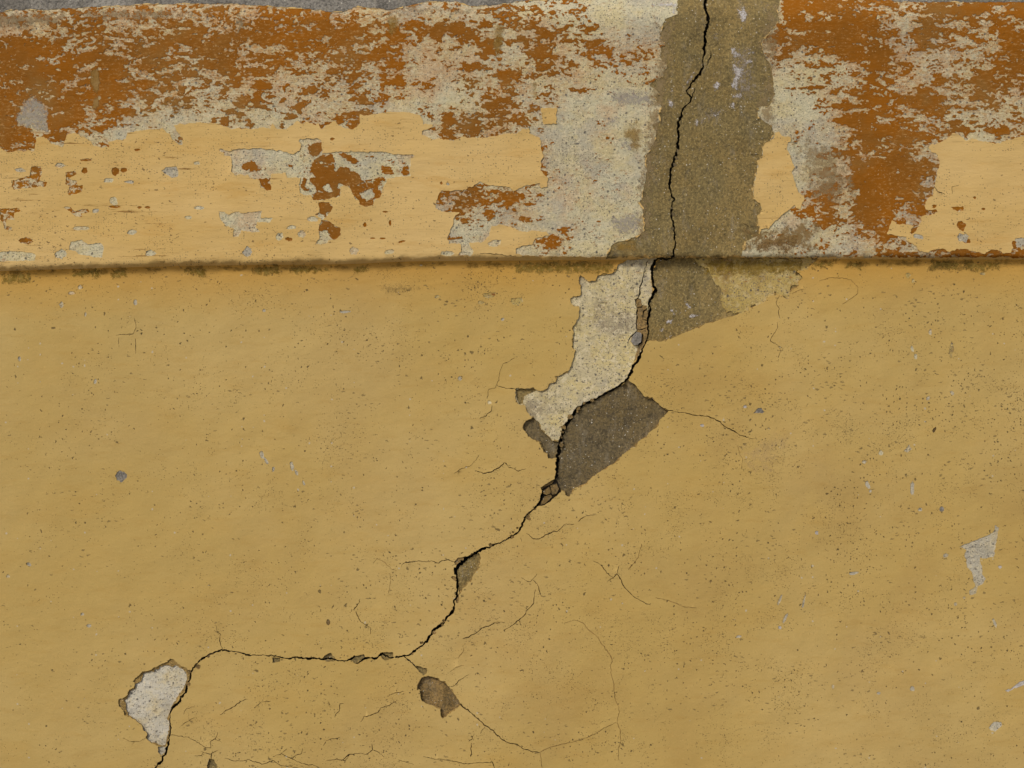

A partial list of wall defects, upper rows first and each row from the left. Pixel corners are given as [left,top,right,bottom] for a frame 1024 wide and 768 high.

peeling [0,0,678,262]
peeling [515,0,1024,506]
crack [124,0,712,768]
crack [662,407,751,468]
peeling [954,525,999,606]
spalling [118,659,190,756]
spalling [416,666,460,718]